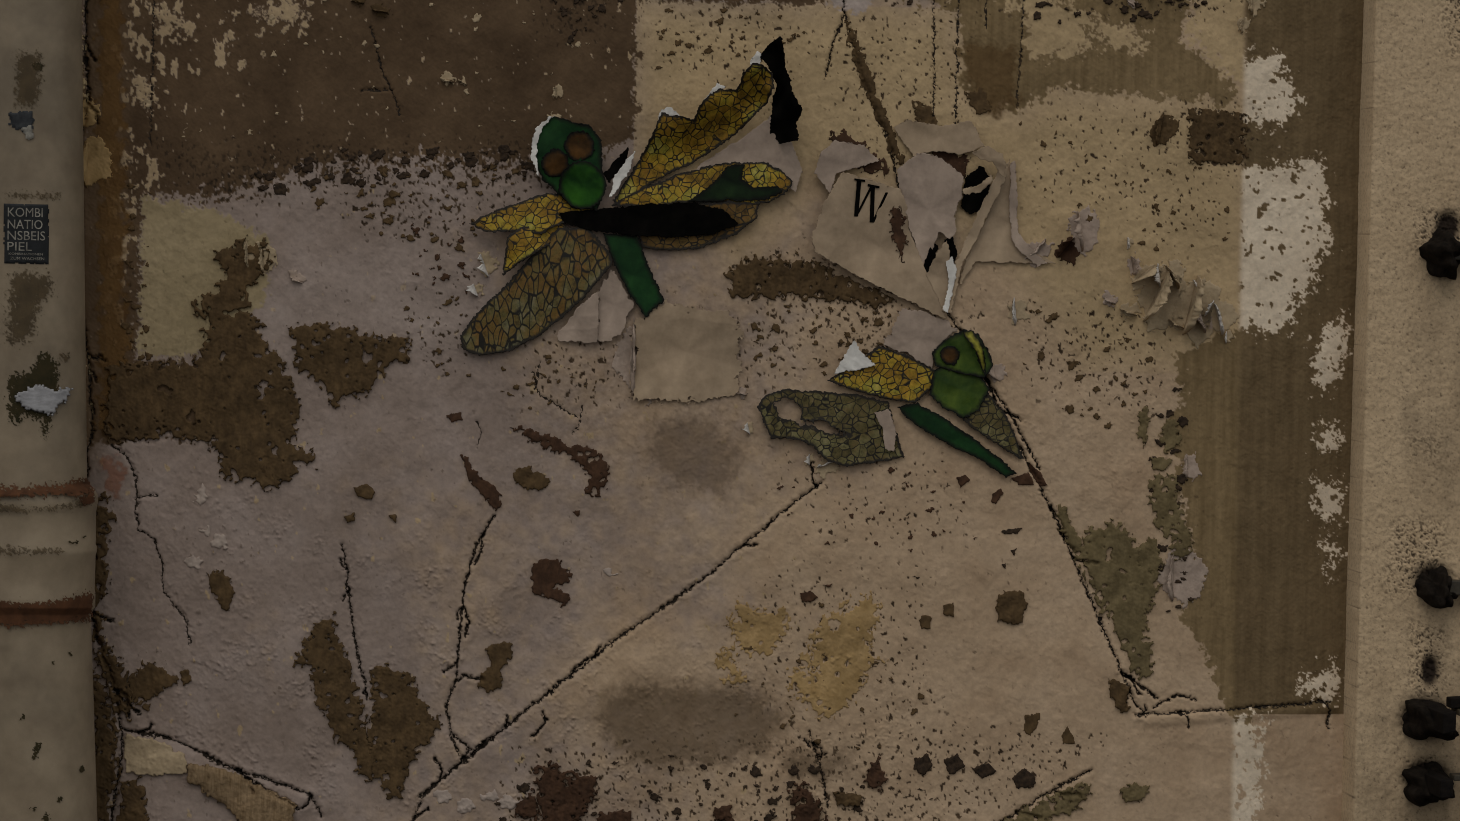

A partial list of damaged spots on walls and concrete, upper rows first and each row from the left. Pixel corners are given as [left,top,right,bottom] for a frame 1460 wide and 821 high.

corrosion [0,536,86,556]
corrosion [0,589,94,630]
corrosion [0,477,95,515]
crack [91,610,322,821]
spalling [101,141,534,492]
crack [340,544,368,700]
spalling [292,611,443,800]
crack [412,462,822,821]
spalling [932,151,971,179]
peeling [1024,201,1100,268]
spalling [1055,108,1249,713]
crack [984,377,1331,729]